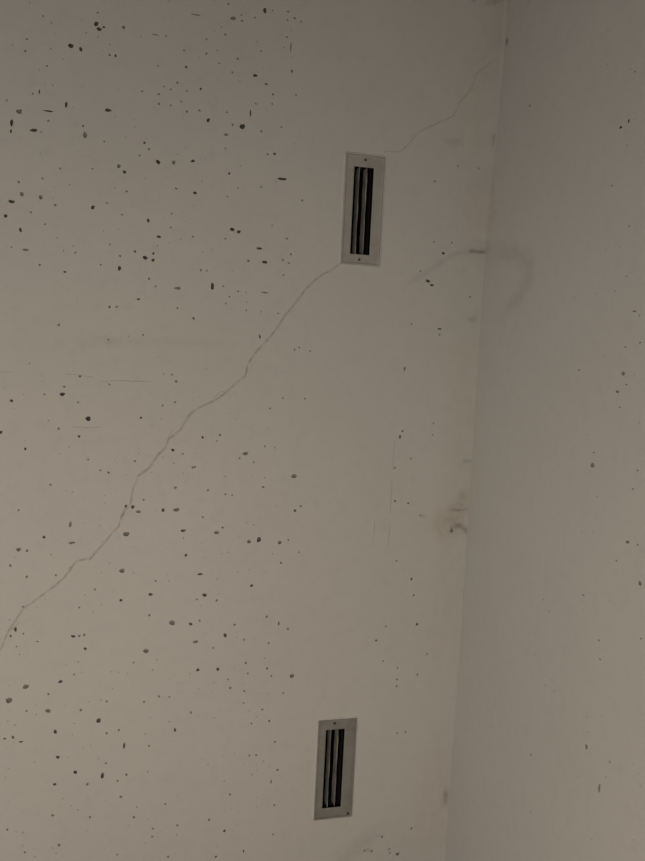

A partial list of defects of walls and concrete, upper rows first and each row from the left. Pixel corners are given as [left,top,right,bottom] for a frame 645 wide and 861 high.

crack [0,263,340,650]